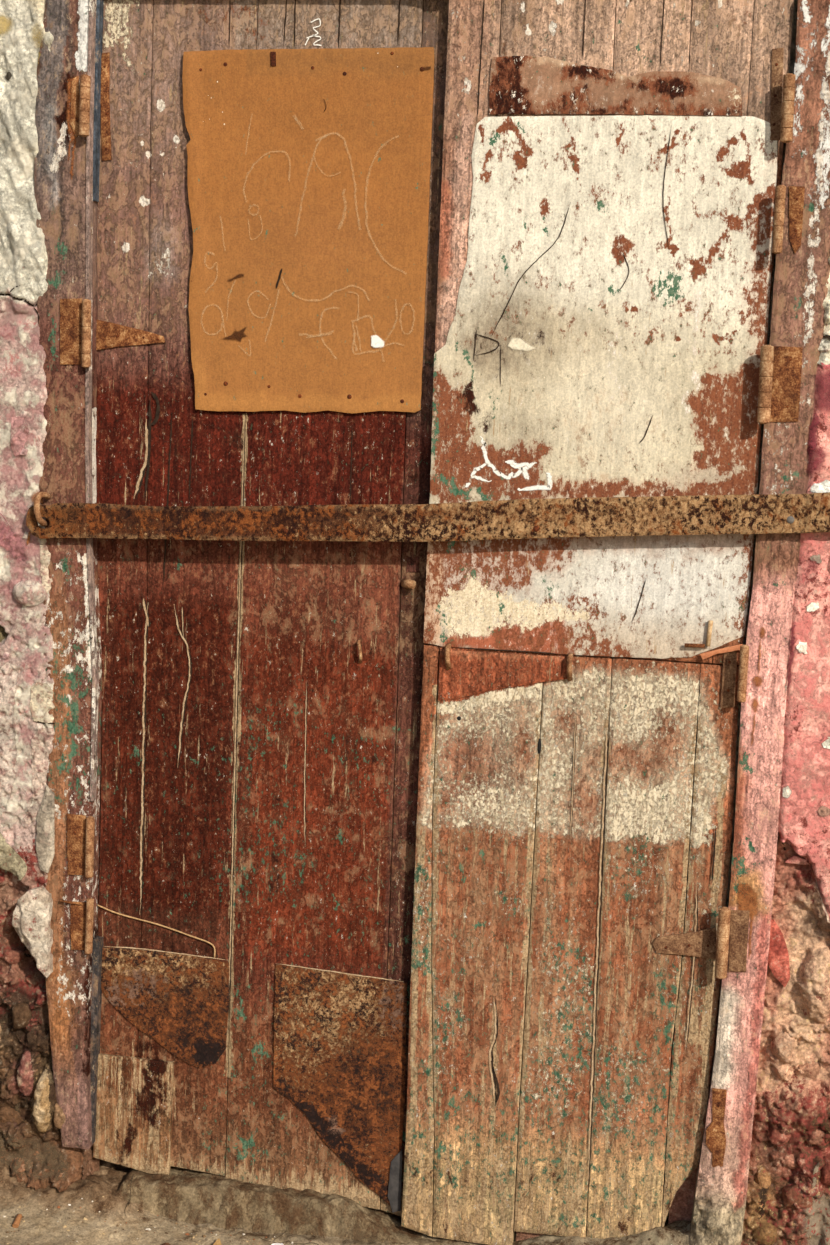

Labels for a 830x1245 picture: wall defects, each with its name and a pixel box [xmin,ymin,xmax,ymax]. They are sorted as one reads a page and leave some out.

spalling [0,626,84,1192]
spalling [741,836,830,1245]